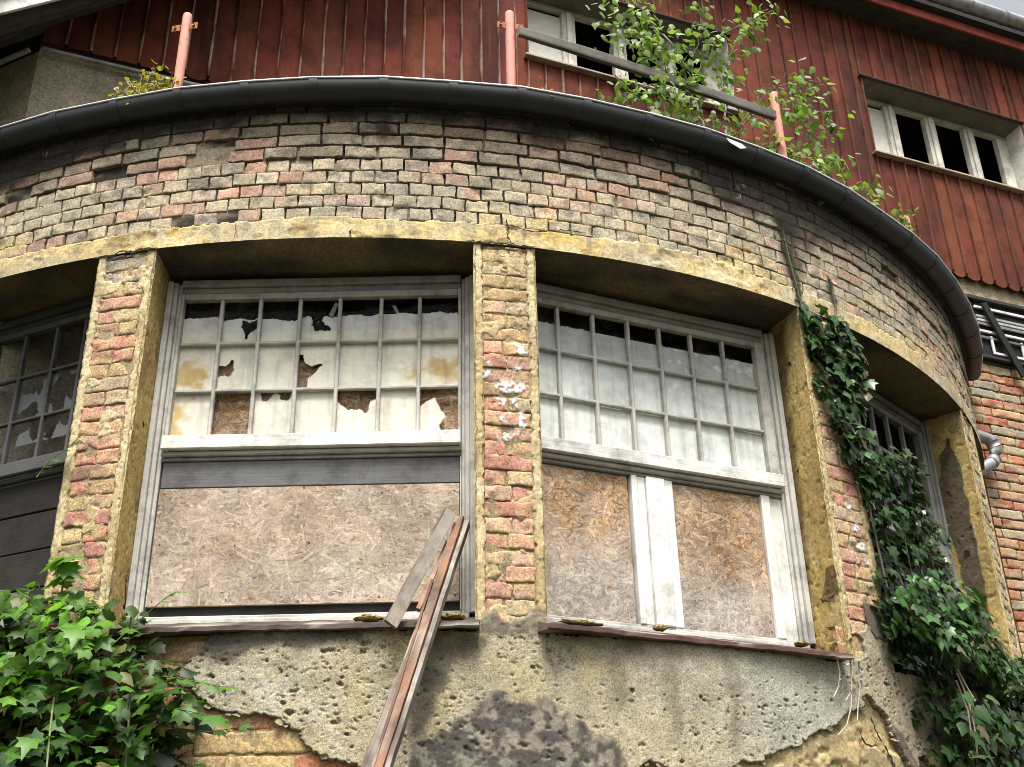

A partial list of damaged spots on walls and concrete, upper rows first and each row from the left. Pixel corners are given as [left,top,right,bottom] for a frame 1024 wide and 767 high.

crack [468,219,586,258]
spalling [0,674,77,735]
spalling [63,636,357,767]
leakage [409,635,627,767]
spalling [733,696,904,767]